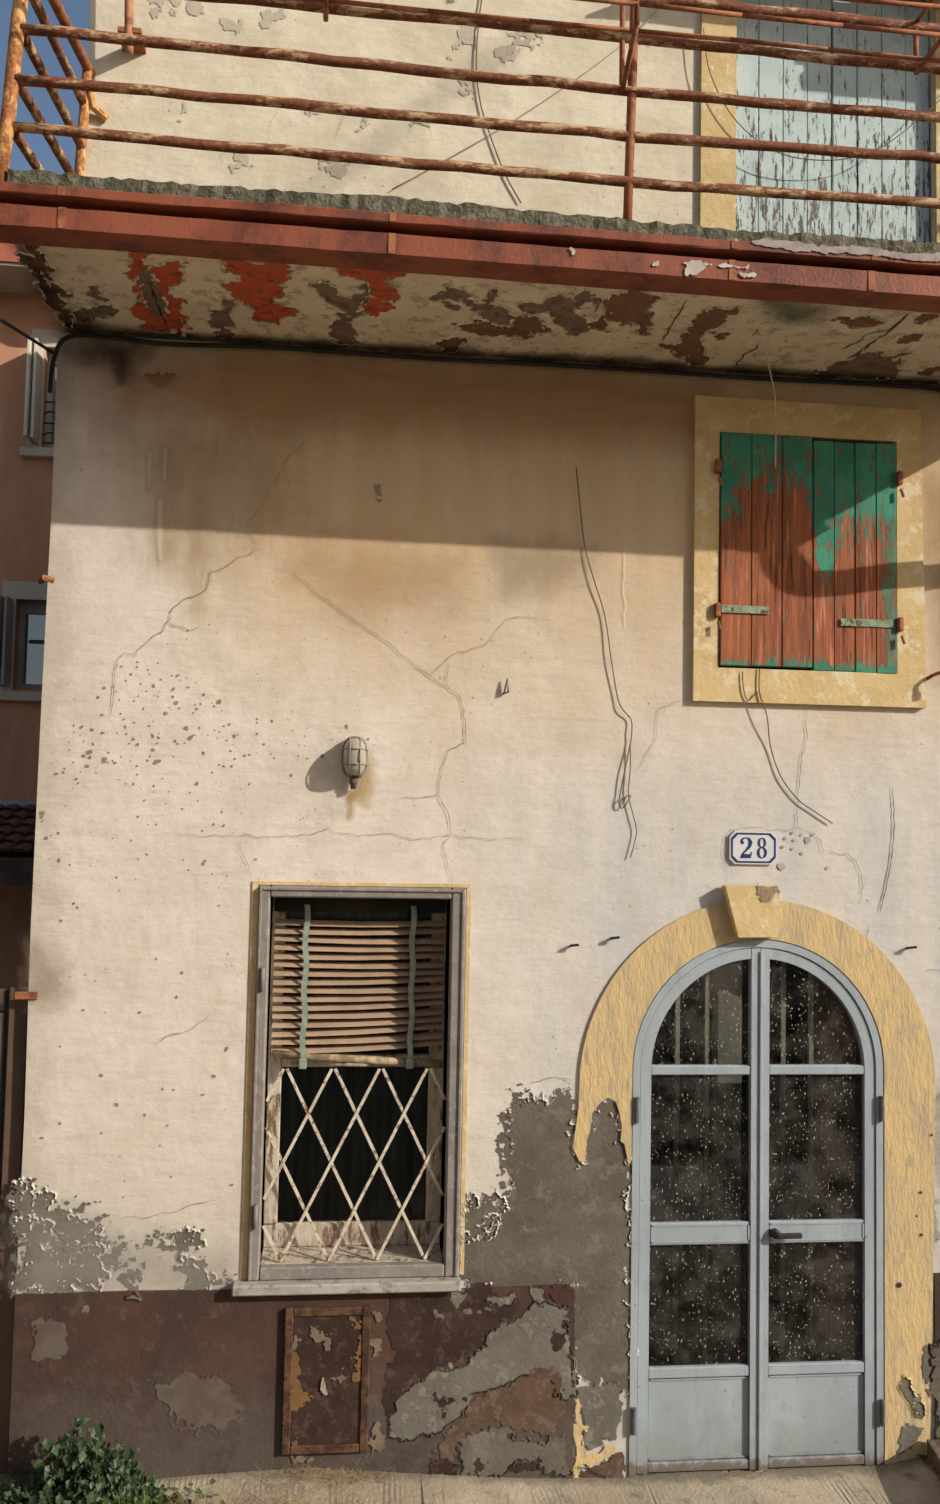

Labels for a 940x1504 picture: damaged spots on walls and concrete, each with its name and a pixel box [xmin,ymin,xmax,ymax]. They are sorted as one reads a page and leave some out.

peeling [14,245,408,346]
spalling [426,284,742,366]
peeling [684,260,757,278]
peeling [734,238,940,262]
spalling [812,313,940,383]
crack [111,548,548,882]
flaking render [5,1176,237,1313]
flaking render [364,1083,643,1478]
peeling [31,1317,69,1362]
peeling [146,1371,245,1437]
peeling [291,1311,382,1412]
peeling [892,1339,940,1455]